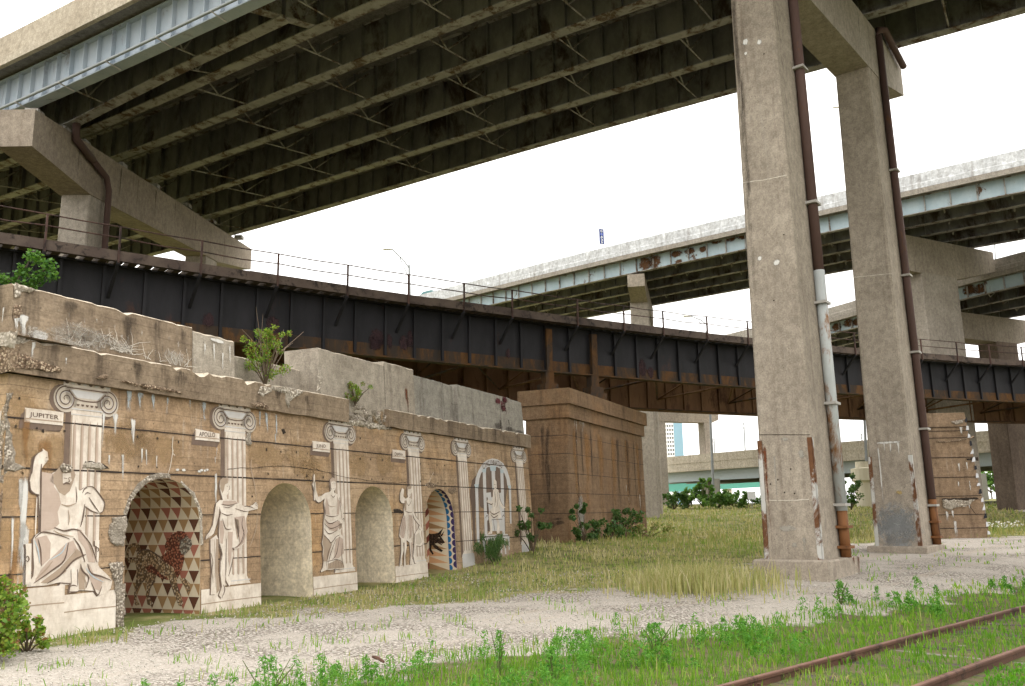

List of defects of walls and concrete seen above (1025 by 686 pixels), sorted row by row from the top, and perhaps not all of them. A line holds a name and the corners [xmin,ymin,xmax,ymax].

rust [639,235,744,270]
spalling [0,283,62,373]
spalling [346,402,392,430]
spalling [936,417,991,538]